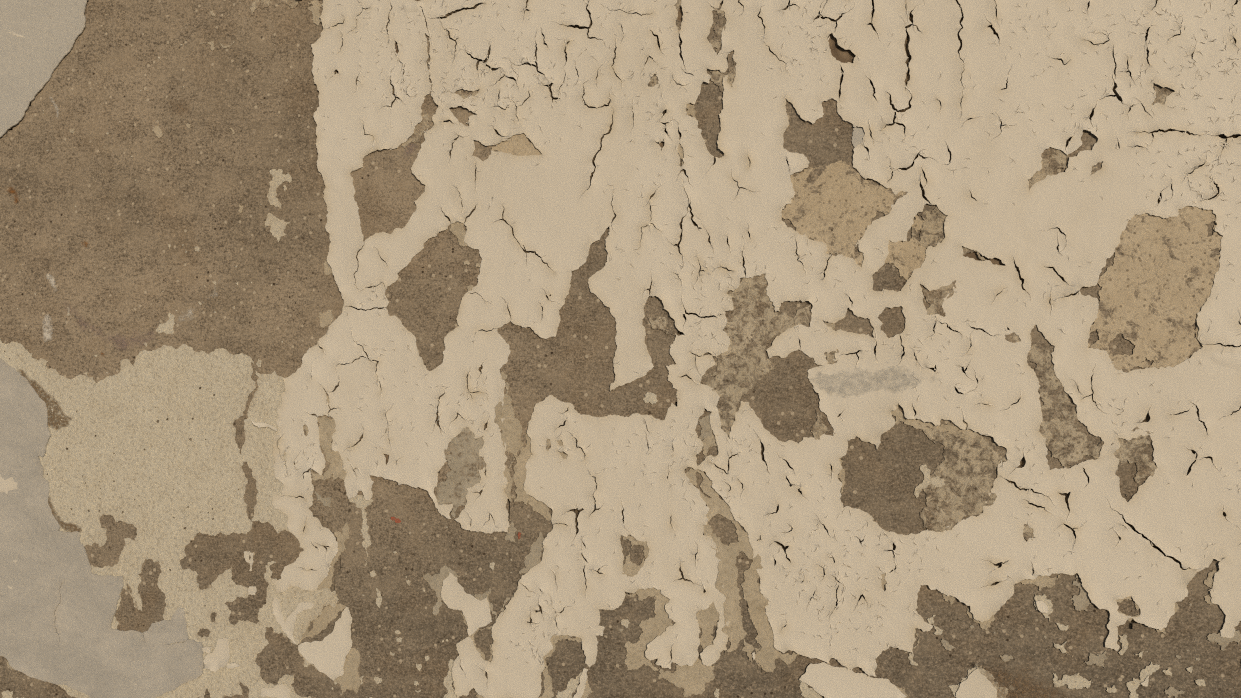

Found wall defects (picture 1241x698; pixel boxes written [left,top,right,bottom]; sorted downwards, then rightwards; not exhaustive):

peeling [0,0,678,698]
crack [277,0,1241,691]
peeling [538,97,1241,698]